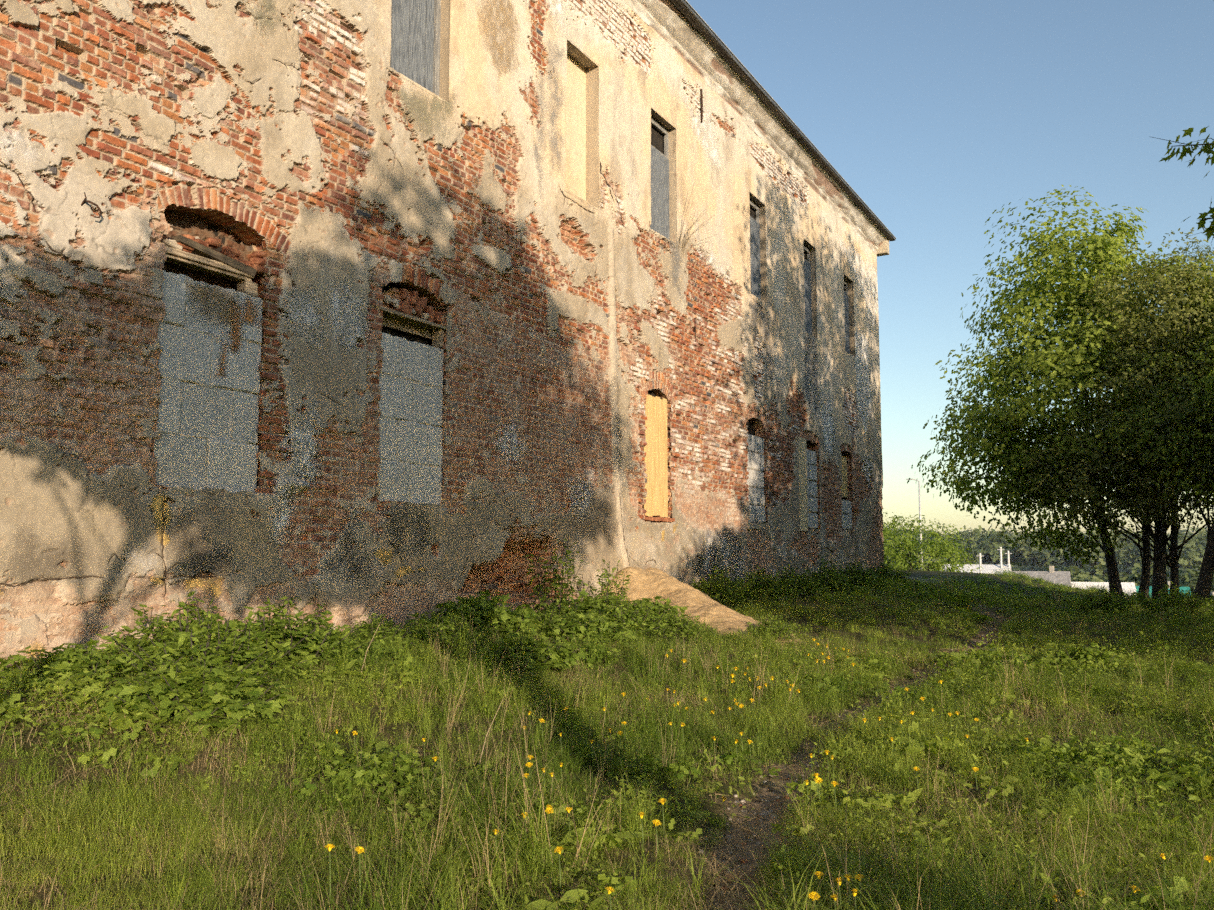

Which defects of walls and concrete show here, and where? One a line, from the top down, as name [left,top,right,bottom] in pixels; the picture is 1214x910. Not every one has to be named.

crack [0,493,215,601]
flaking render [0,0,884,671]